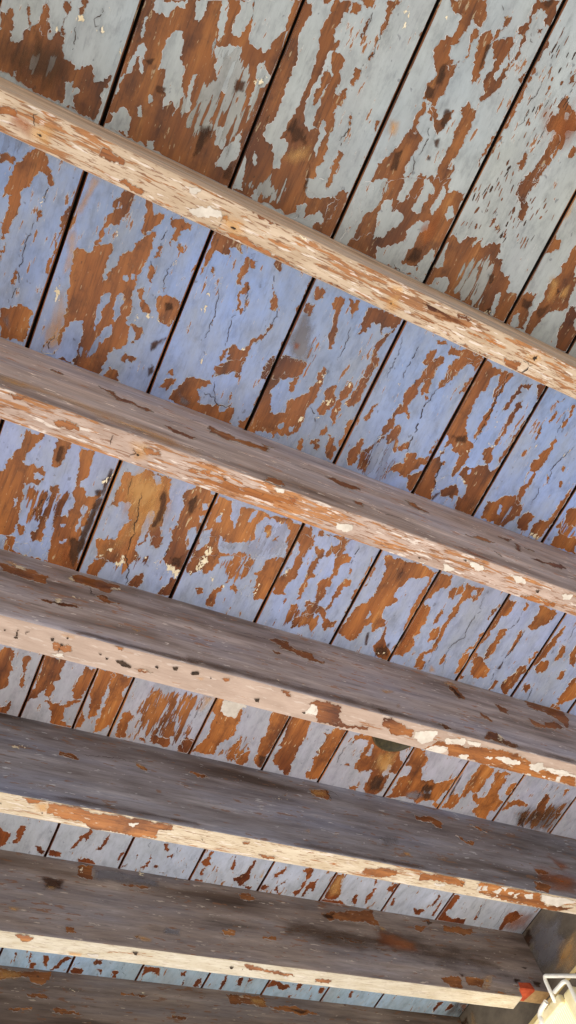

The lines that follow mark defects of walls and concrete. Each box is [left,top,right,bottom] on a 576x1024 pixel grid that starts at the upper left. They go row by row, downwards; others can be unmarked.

peeling [0,0,576,571]
peeling [0,420,485,670]
peeling [0,575,576,848]
peeling [22,797,178,890]
peeling [194,851,214,882]
peeling [230,854,399,926]
peeling [413,873,576,936]